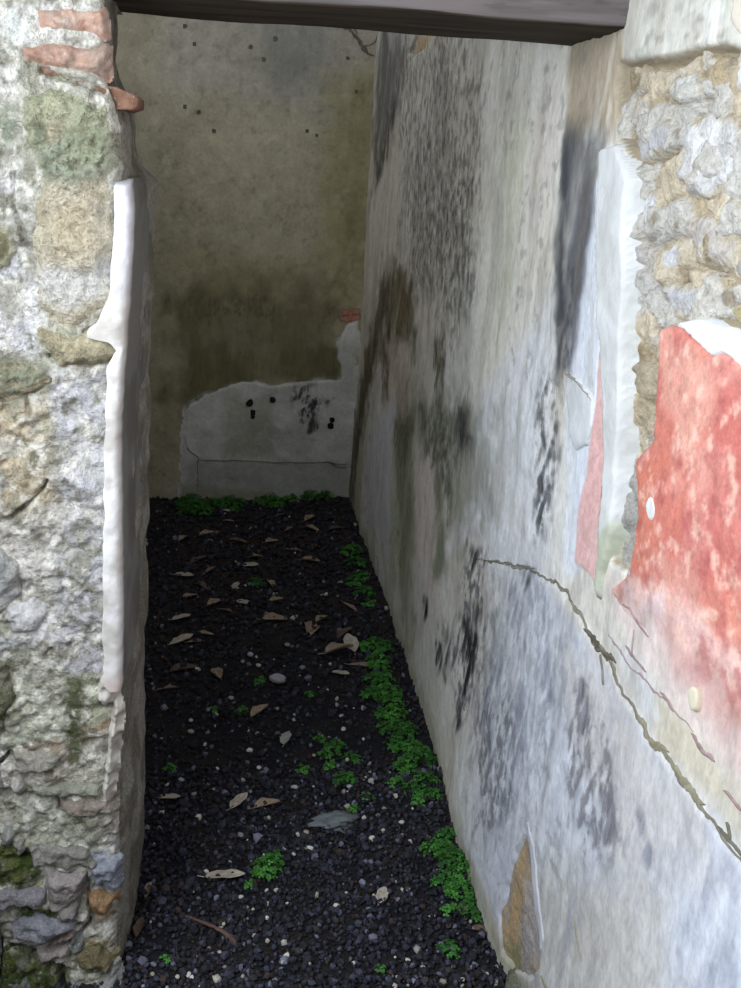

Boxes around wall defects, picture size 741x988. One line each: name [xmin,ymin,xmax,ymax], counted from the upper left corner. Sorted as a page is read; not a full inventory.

crack [343,28,377,56]
damp [372,32,481,309]
flaking render [87,176,150,802]
flaking render [178,320,360,500]
damp [349,274,394,499]
damp [394,337,468,577]
damp [534,129,603,533]
peeling [574,51,741,717]
damp [435,540,514,830]
flaking render [493,818,544,978]
damp [568,679,617,847]
crack [473,557,741,861]